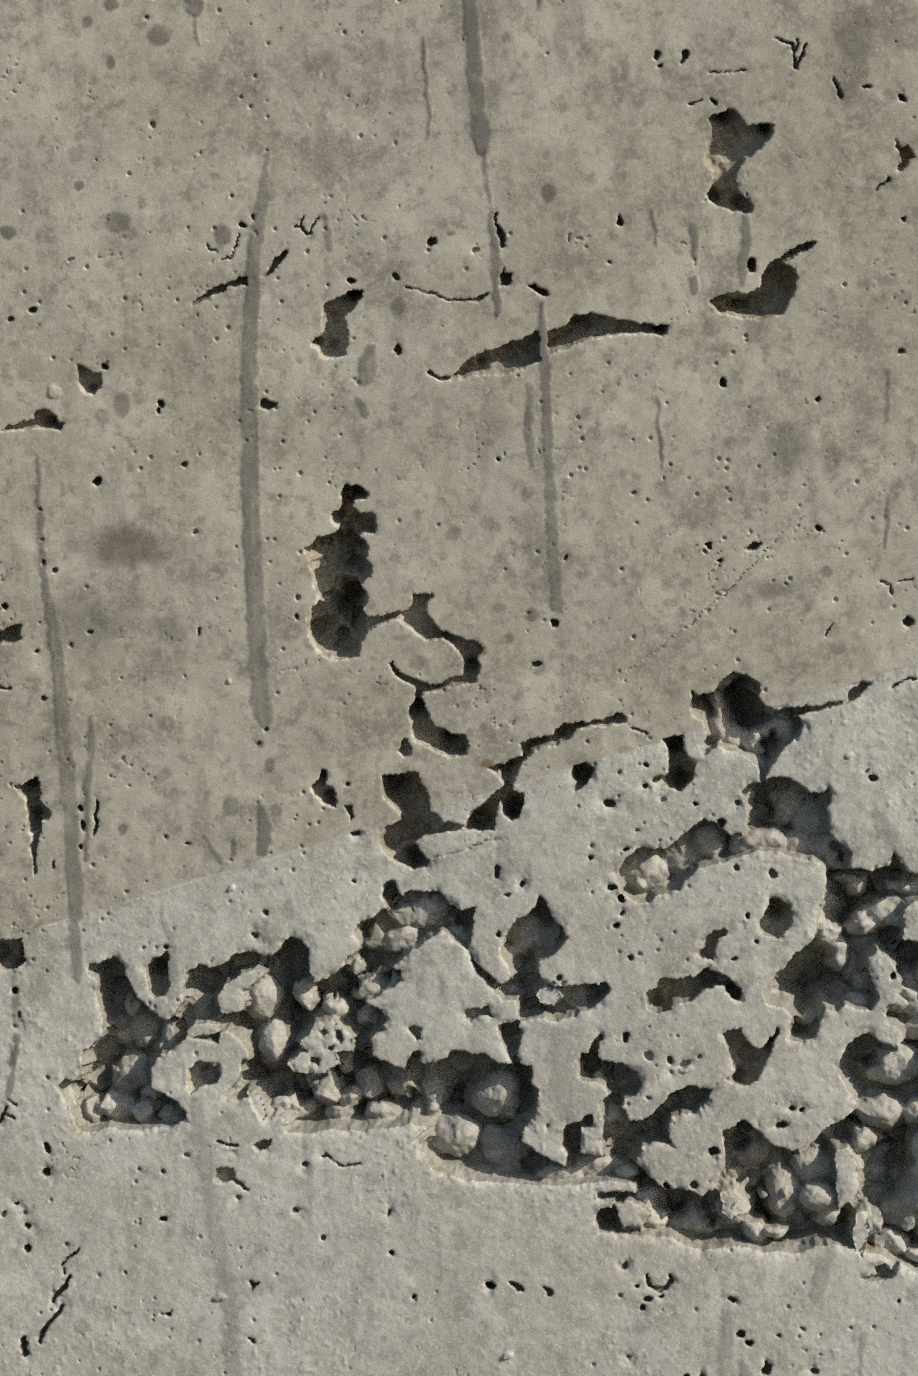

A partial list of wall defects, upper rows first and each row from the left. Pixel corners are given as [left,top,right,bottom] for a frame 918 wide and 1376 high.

water stain [466,5,482,67]
water stain [474,112,491,154]
hole [705,109,774,214]
water stain [247,239,260,321]
hole [709,241,817,320]
spalling [427,312,669,381]
water stain [242,361,259,619]
hole [304,484,377,661]
spalling [380,697,626,870]
water stain [259,806,272,855]
hole [646,928,742,1014]
hole [722,1027,780,1086]